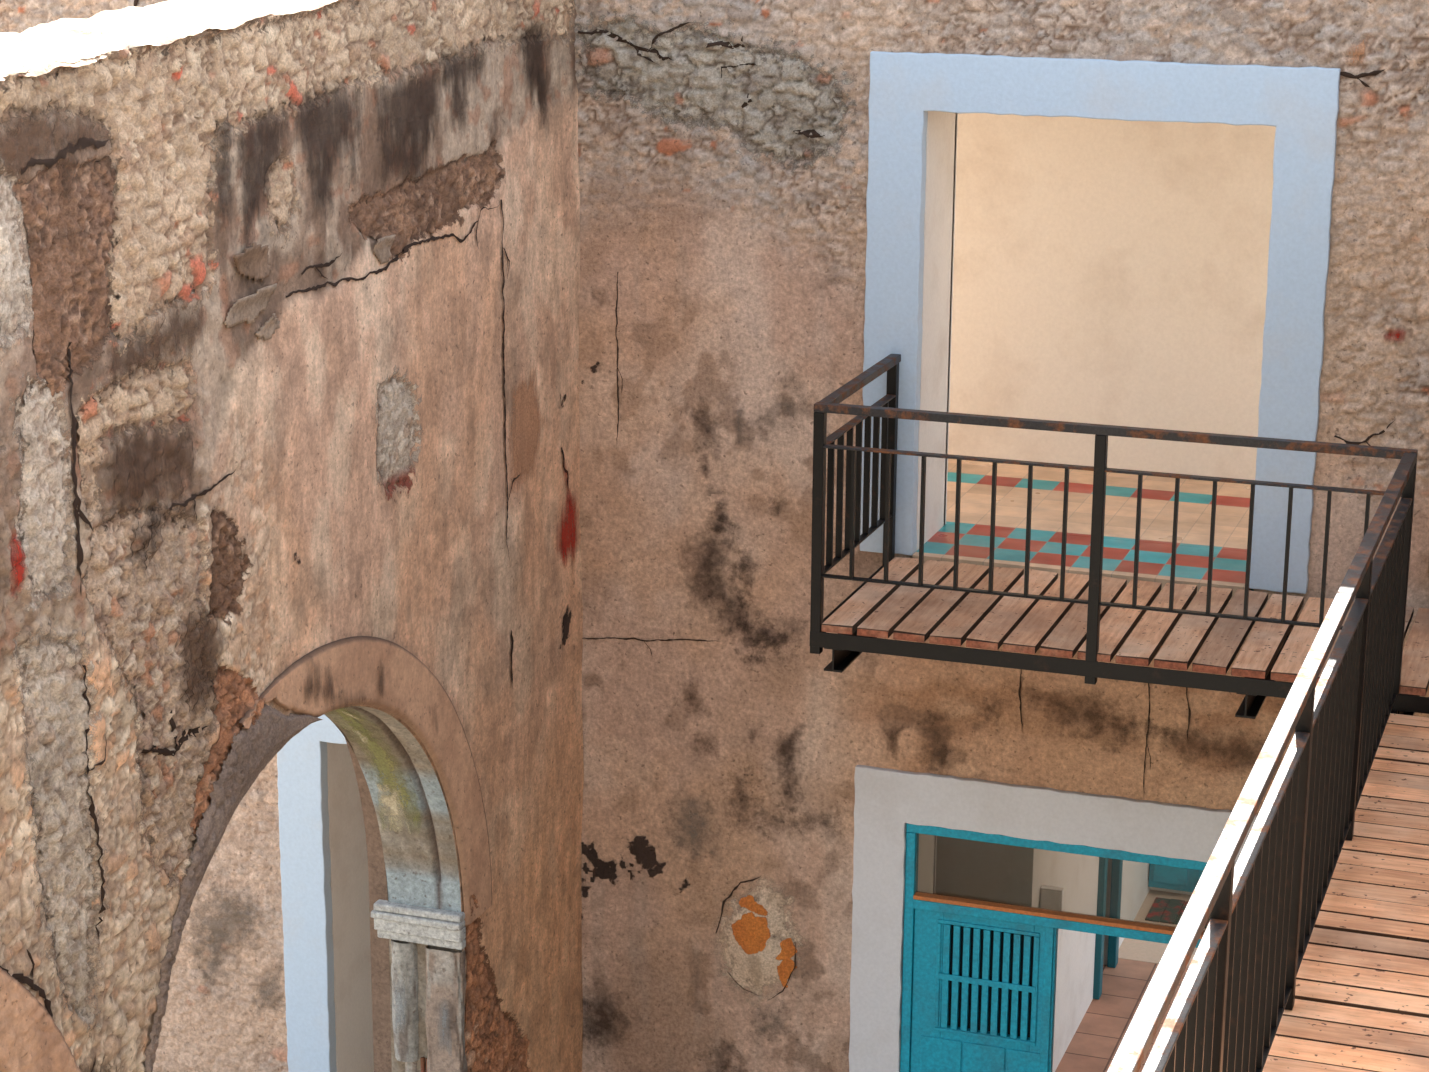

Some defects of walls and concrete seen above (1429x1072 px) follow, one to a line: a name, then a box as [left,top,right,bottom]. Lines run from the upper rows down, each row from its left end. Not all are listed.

water stain [219,91,360,248]
water stain [379,49,481,173]
water stain [521,25,547,122]
crack [578,22,756,108]
crack [793,129,825,138]
crack [1340,69,1385,87]
crack [286,200,522,560]
crack [67,342,94,593]
water stain [113,432,188,560]
spalling [0,0,857,1072]
crack [561,447,569,491]
water stain [692,514,787,646]